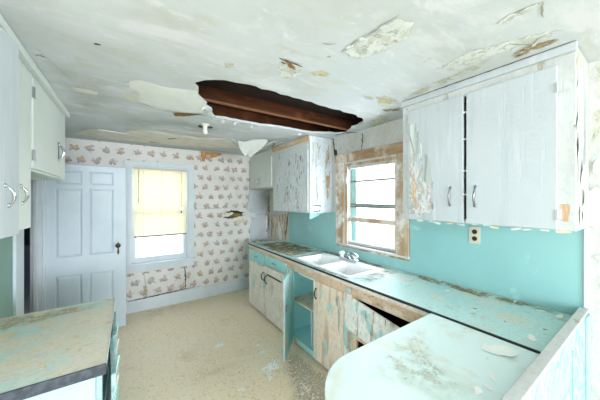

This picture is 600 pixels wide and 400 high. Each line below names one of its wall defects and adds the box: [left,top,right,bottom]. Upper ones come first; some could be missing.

peeling [341,15,414,59]
peeling [434,31,554,71]
peeling [278,58,302,79]
peeling [124,80,240,125]
peeling [226,136,285,157]
hole [222,209,257,225]
crack [129,268,199,302]